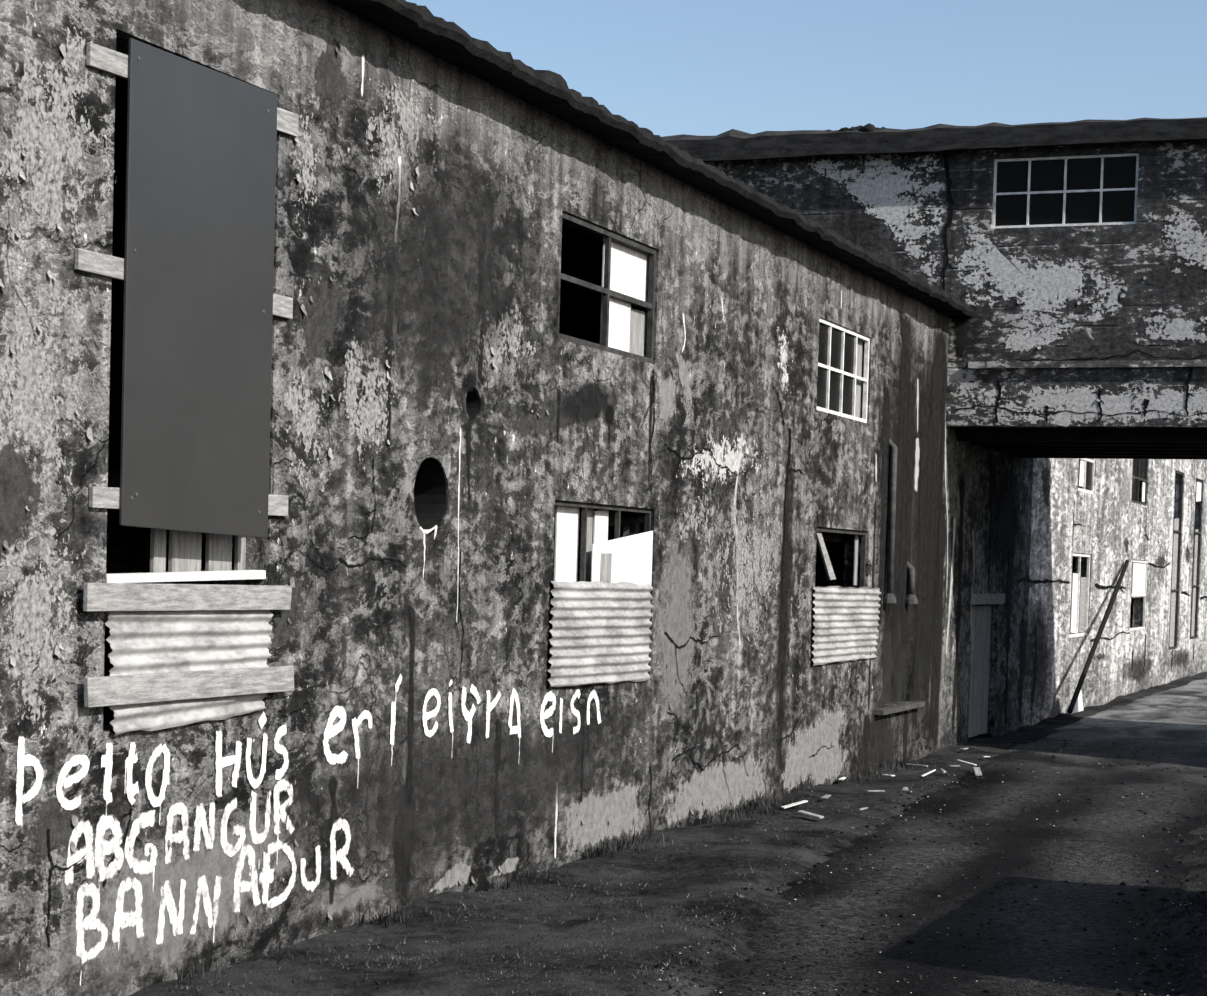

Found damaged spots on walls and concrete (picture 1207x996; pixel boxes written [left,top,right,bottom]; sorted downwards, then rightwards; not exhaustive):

crack [941,151,966,291]
peeling [808,153,1207,352]
damp [363,147,513,451]
damp [557,383,614,443]
peeling [950,382,1207,426]
crack [955,350,1207,423]
damp [458,423,471,573]
spalling [1041,459,1052,511]
damp [420,525,437,578]